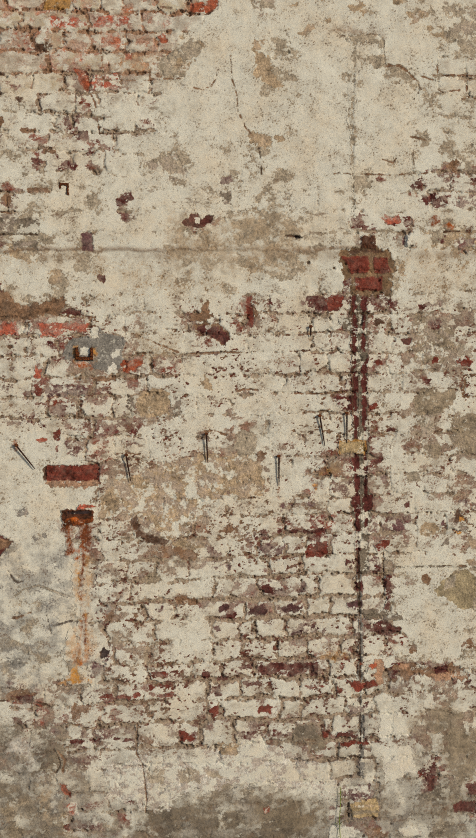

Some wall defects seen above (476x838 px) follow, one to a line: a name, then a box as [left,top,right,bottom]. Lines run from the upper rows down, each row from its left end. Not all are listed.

flaking render [158,0,220,16]
crack [90,42,263,175]
crack [0,211,38,236]
rust [69,344,99,372]
flaking render [33,349,144,418]
flaking render [126,387,182,418]
flaking render [35,424,267,576]
rust [54,516,104,686]
flaking render [213,581,327,637]
flaking render [251,527,329,560]
spalling [358,519,409,636]
flaking render [419,496,476,611]